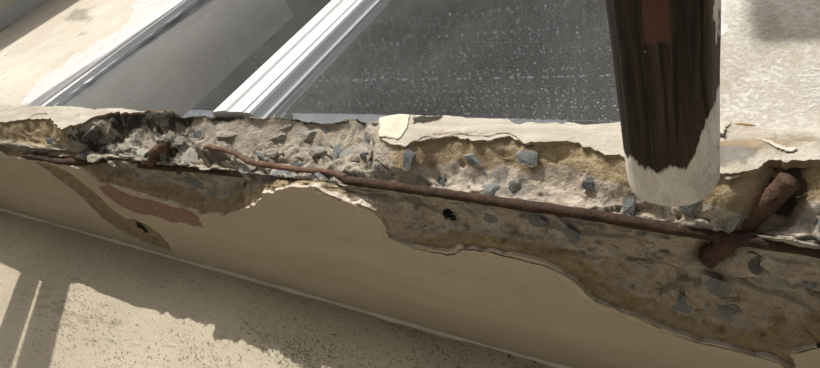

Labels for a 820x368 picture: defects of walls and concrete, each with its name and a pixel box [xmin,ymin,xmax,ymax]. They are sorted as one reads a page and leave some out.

corrosion [22,153,107,165]
corrosion [135,162,244,178]
spalling [0,112,820,365]
corrosion [341,172,820,269]
crack [671,325,820,368]